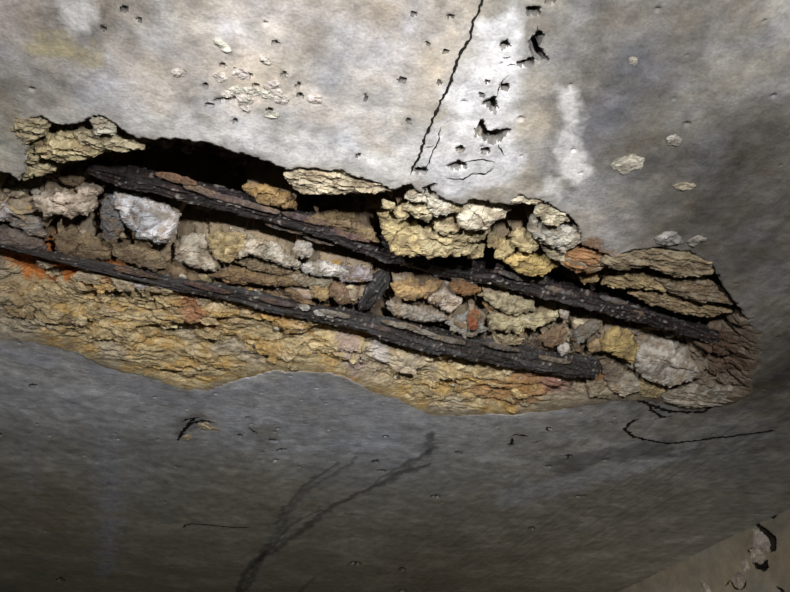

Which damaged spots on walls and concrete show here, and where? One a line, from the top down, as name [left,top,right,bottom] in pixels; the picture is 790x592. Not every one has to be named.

spalling [499,0,556,69]
crack [410,0,483,175]
spalling [482,76,510,115]
corrosion [0,160,761,408]
spalling [0,115,763,417]
crack [623,400,777,445]
crack [182,521,251,529]
spalling [726,523,777,590]